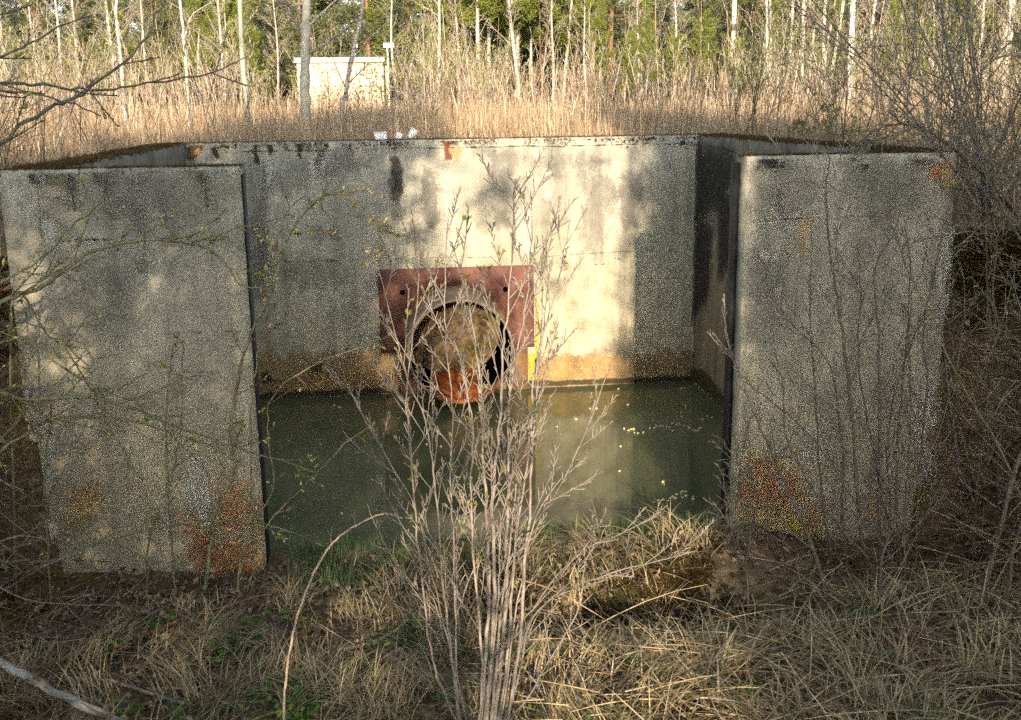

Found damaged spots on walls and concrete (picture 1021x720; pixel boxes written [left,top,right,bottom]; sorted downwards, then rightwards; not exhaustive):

water stain [388,156,403,202]
rust [443,141,463,162]
rust [913,156,957,189]
water stain [691,139,733,325]
water stain [258,347,402,399]
rust [738,445,827,541]
rust [178,470,265,575]